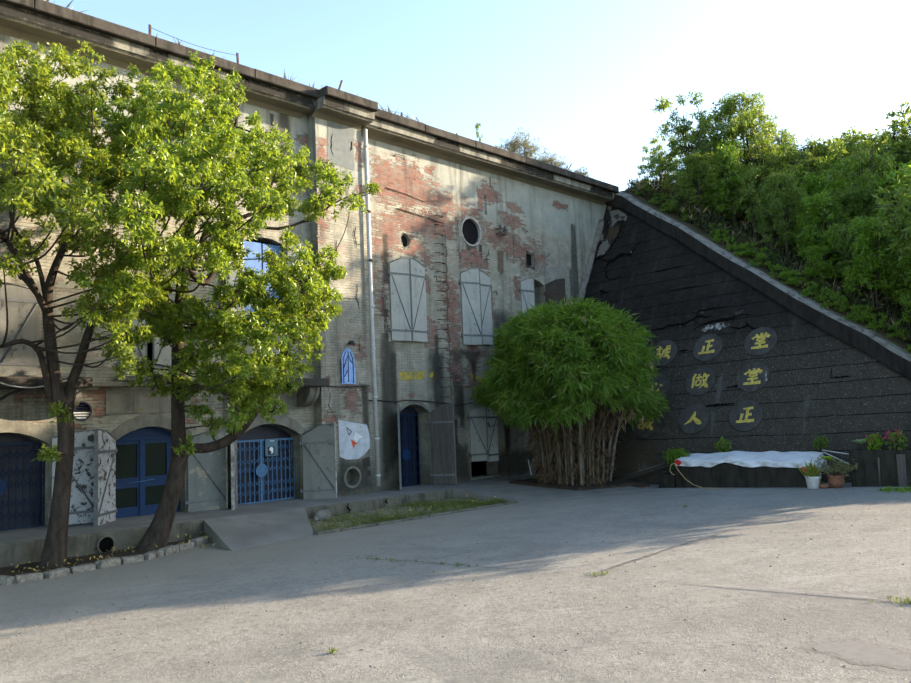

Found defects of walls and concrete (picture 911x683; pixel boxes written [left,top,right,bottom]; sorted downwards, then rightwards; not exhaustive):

peeling [295,122,555,401]
crack [593,221,642,295]
crack [653,306,760,352]